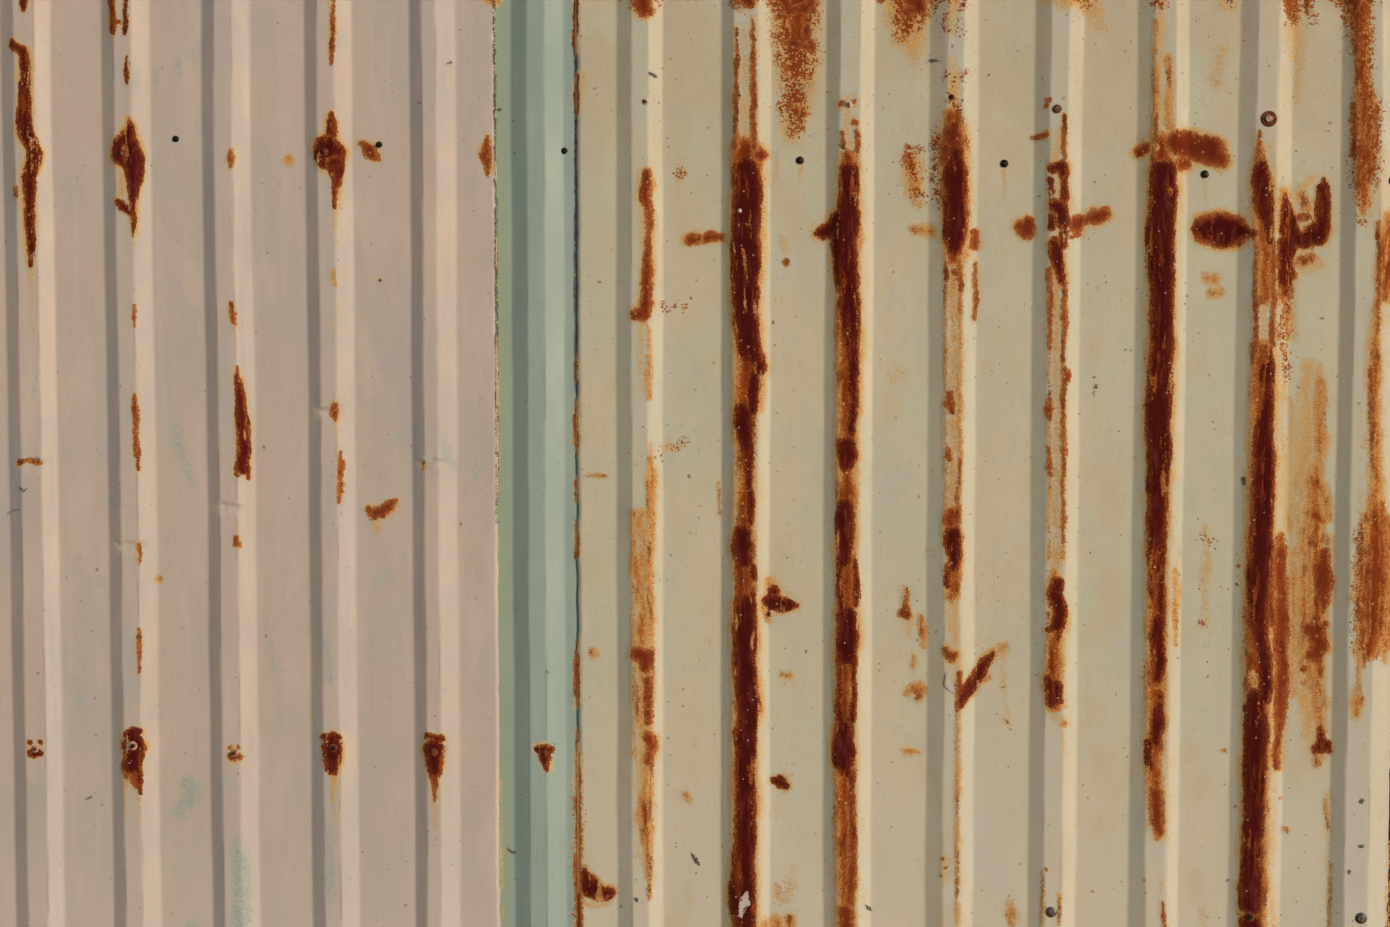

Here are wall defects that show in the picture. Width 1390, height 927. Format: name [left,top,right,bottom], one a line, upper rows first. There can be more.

rust [6,33,47,338]
rust [105,0,149,331]
rust [116,724,153,832]
rust [230,364,256,482]
rust [280,106,384,507]
rust [417,730,450,844]
rust [626,158,689,402]
rust [625,436,691,902]
rust [676,0,871,927]
rust [896,56,1012,927]
rust [1001,95,1116,789]
rust [1127,0,1390,927]